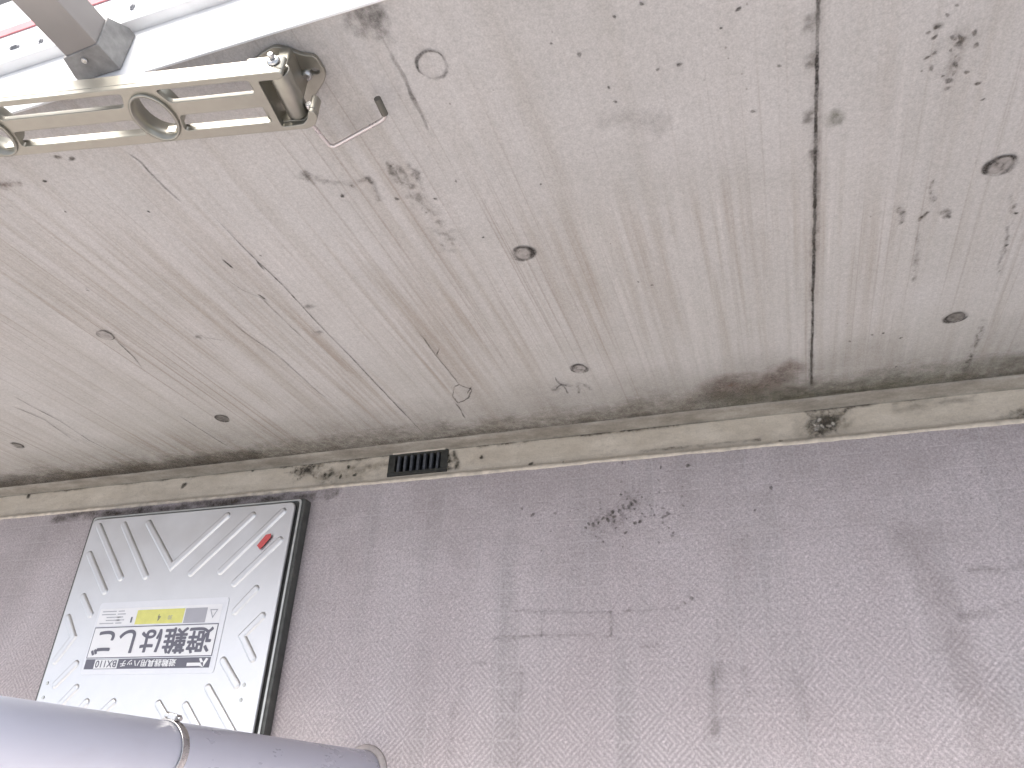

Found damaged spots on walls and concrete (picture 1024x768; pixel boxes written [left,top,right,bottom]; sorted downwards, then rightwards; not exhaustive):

crack [810,51,819,385]